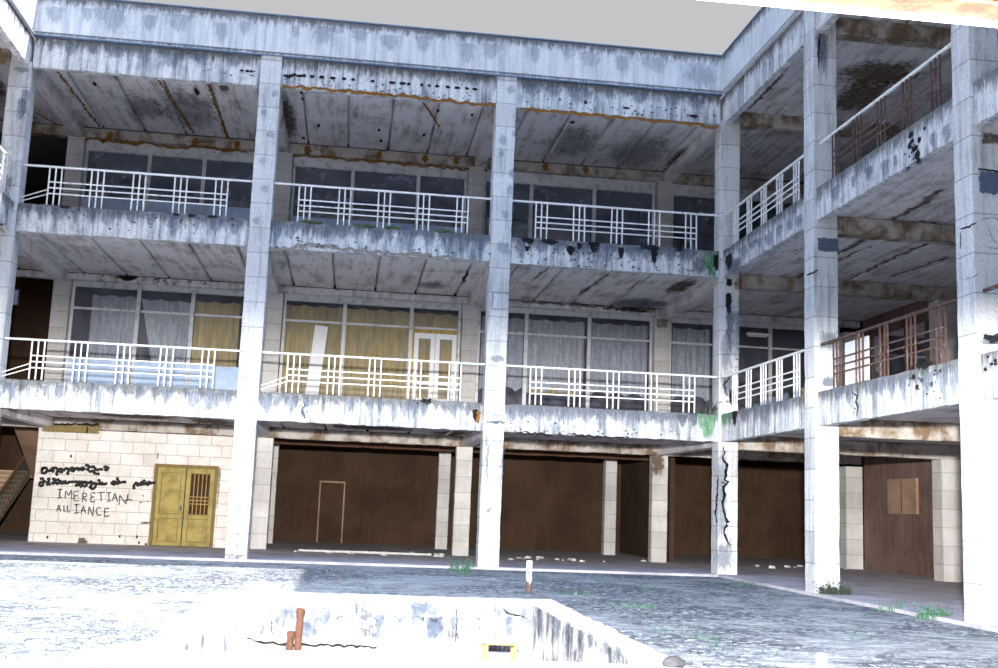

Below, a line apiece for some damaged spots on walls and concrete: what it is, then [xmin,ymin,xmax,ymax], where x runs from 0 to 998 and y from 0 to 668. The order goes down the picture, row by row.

damp [817,33,828,69]
rust [56,71,247,153]
rust [282,84,496,127]
damp [836,60,920,111]
rust [286,146,469,171]
spalling [904,127,926,170]
peeling [978,168,998,195]
peeling [817,237,839,252]
damp [506,293,805,435]
crack [714,447,731,546]
crack [246,607,377,649]
damp [268,600,593,648]